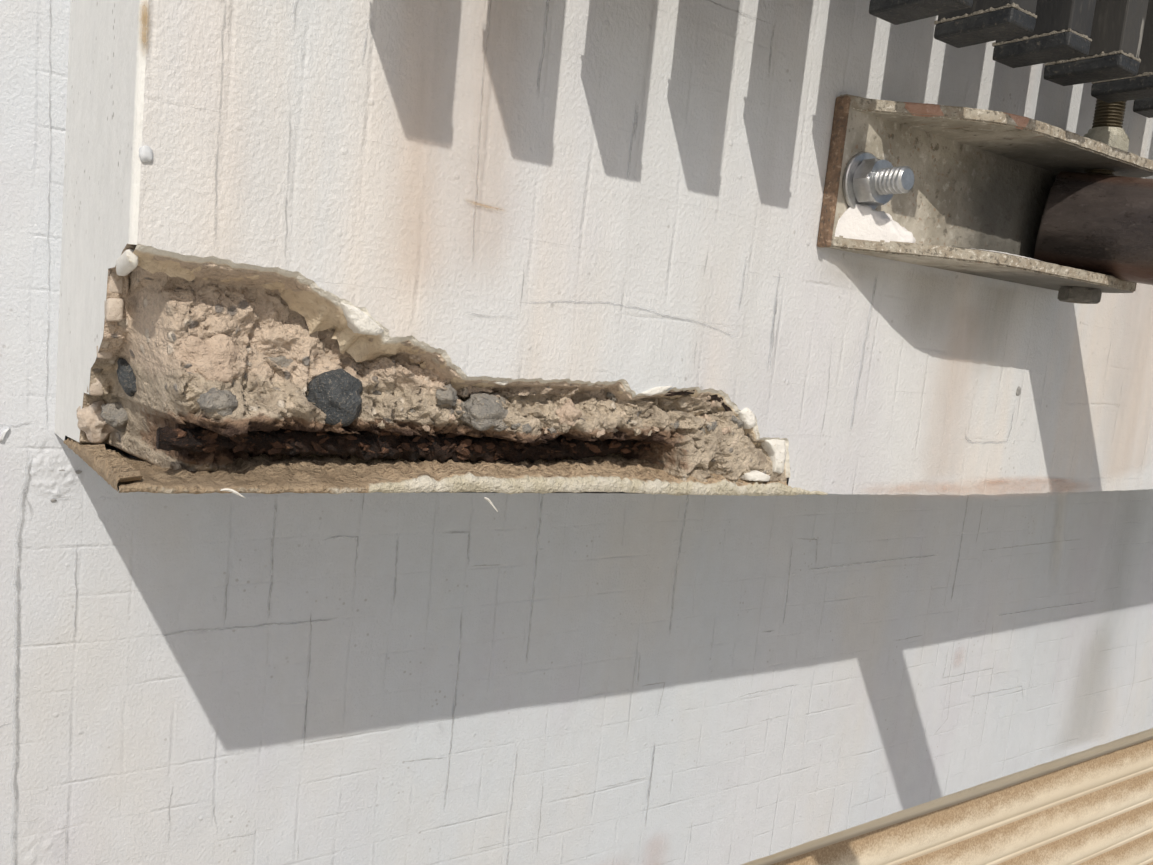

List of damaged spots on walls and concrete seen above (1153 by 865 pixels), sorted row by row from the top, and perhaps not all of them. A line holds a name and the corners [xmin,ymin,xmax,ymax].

spalling [63,243,828,512]
crack [13,466,31,799]